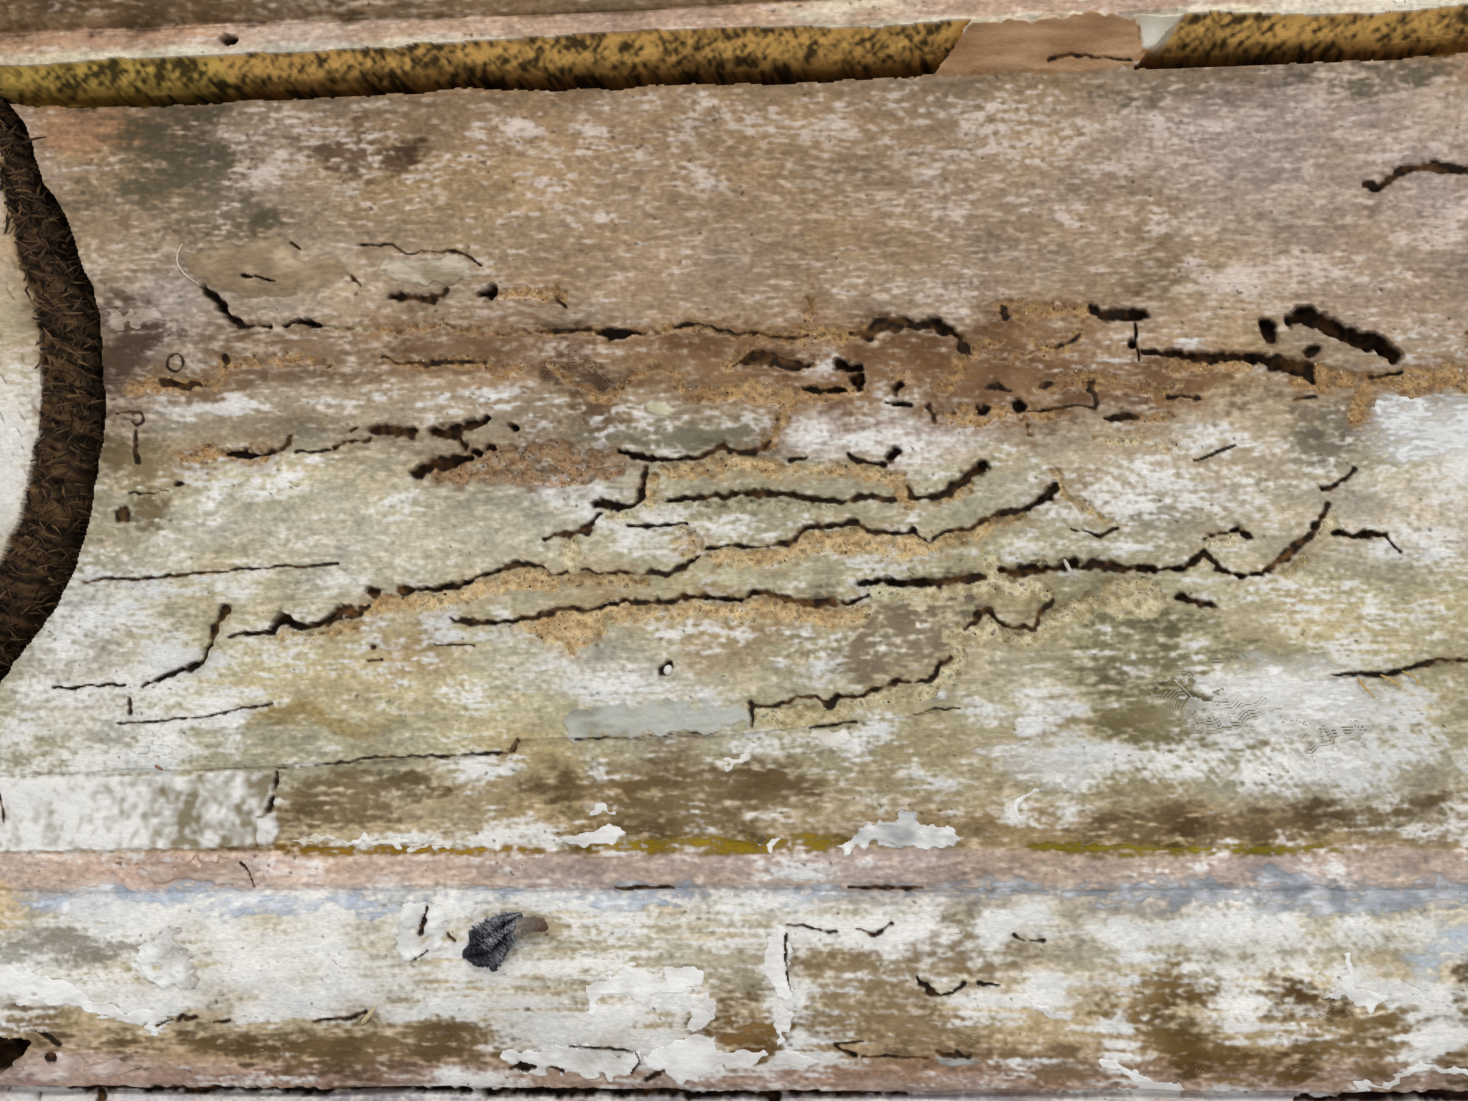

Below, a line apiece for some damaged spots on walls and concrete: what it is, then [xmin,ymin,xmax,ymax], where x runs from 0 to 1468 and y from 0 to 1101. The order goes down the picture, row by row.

crack [1363,159,1468,193]
crack [1320,467,1359,492]
crack [660,489,899,513]
crack [1175,593,1217,619]
crack [53,563,340,726]
crack [1331,658,1468,679]
peeling [837,810,964,857]
spalling [394,902,450,961]
peeling [0,968,174,1036]
peeling [500,925,822,1085]
spalling [19,1051,141,1081]
peeling [1353,1062,1468,1092]